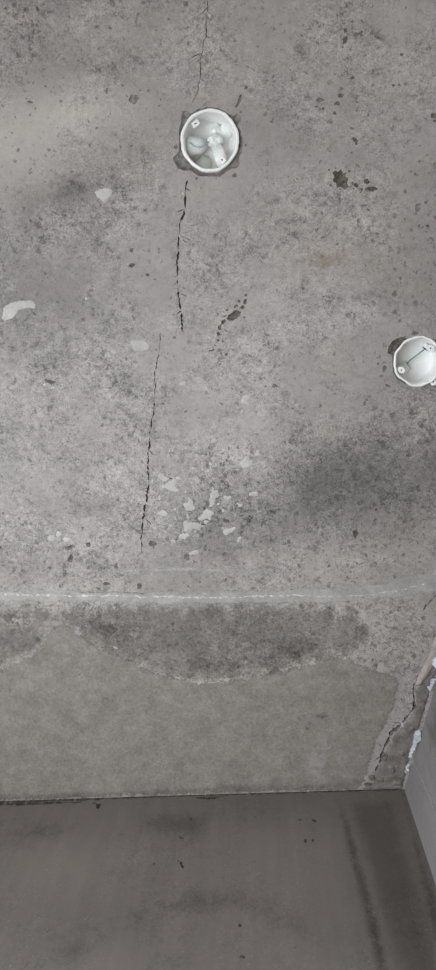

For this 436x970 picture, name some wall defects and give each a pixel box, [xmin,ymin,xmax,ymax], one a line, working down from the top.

crack [191,2,211,103]
crack [139,180,190,552]
peeling [0,624,436,809]